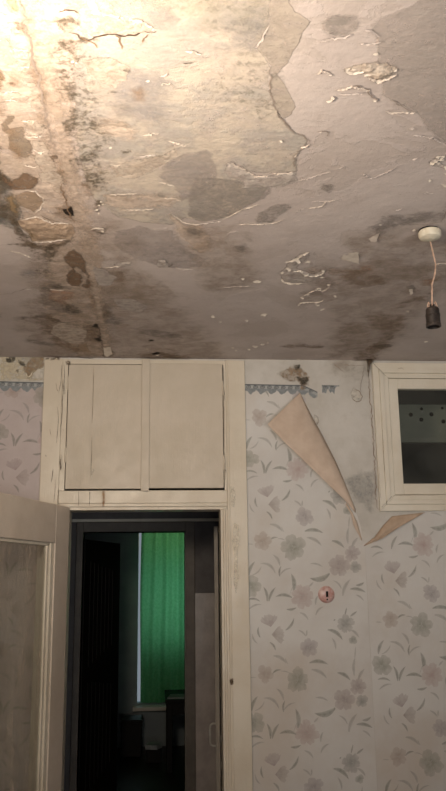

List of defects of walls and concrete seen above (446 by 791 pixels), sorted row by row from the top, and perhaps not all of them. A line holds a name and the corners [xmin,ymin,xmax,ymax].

crack [69,31,155,49]
peeling [344,29,397,84]
peeling [45,0,352,253]
peeling [33,141,64,186]
water stain [0,0,113,356]
peeling [281,252,337,311]
spalling [0,357,70,379]